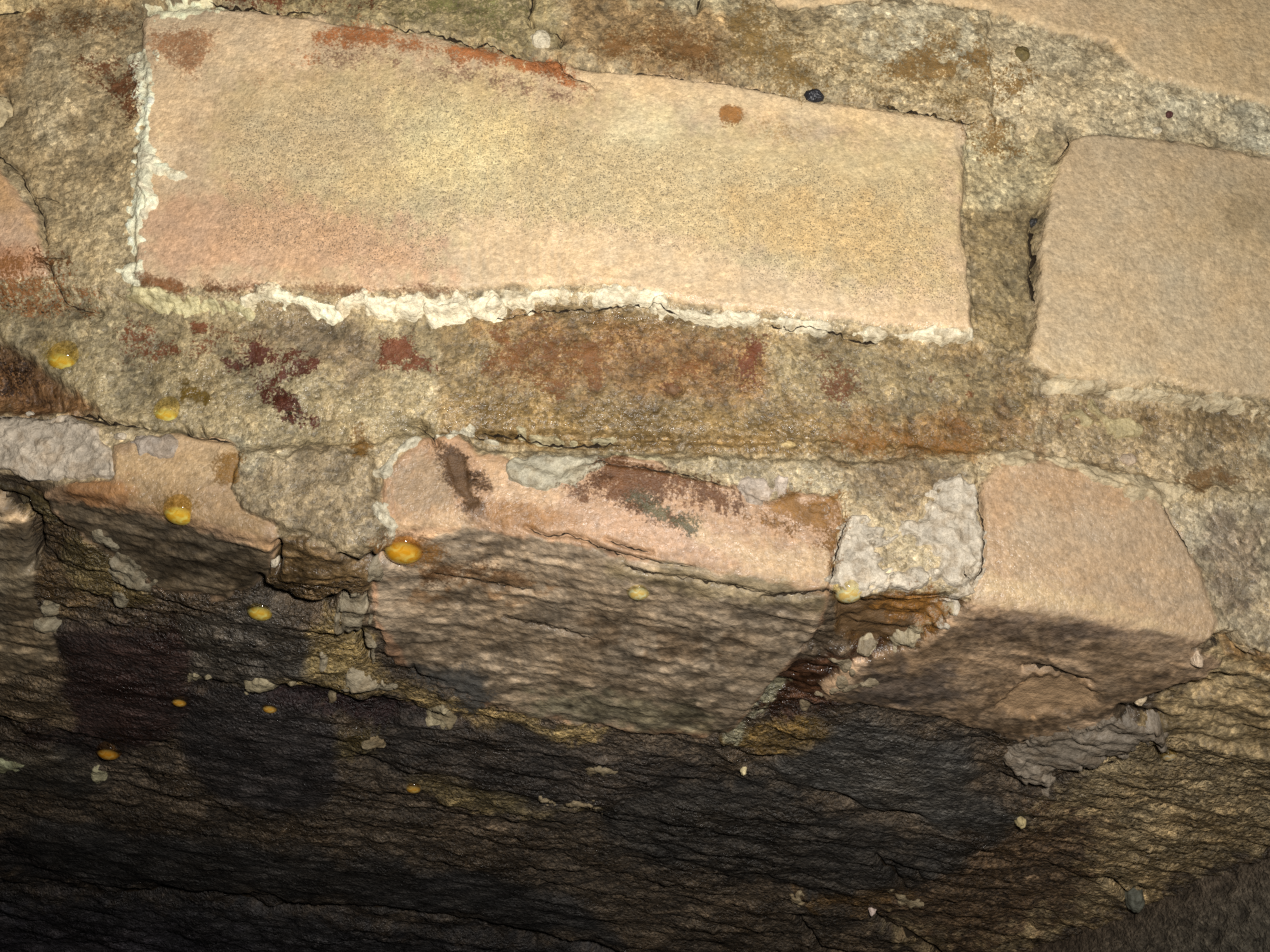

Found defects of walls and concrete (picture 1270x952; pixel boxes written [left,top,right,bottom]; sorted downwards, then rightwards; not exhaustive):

damp [142,0,225,22]
rust [27,0,213,137]
rust [221,0,587,102]
damp [115,49,974,347]
damp [373,424,499,479]
damp [737,475,788,506]
damp [33,600,62,633]
damp [91,529,158,608]
damp [328,501,524,703]
damp [799,473,987,711]
damp [244,677,297,695]
damp [425,704,457,730]